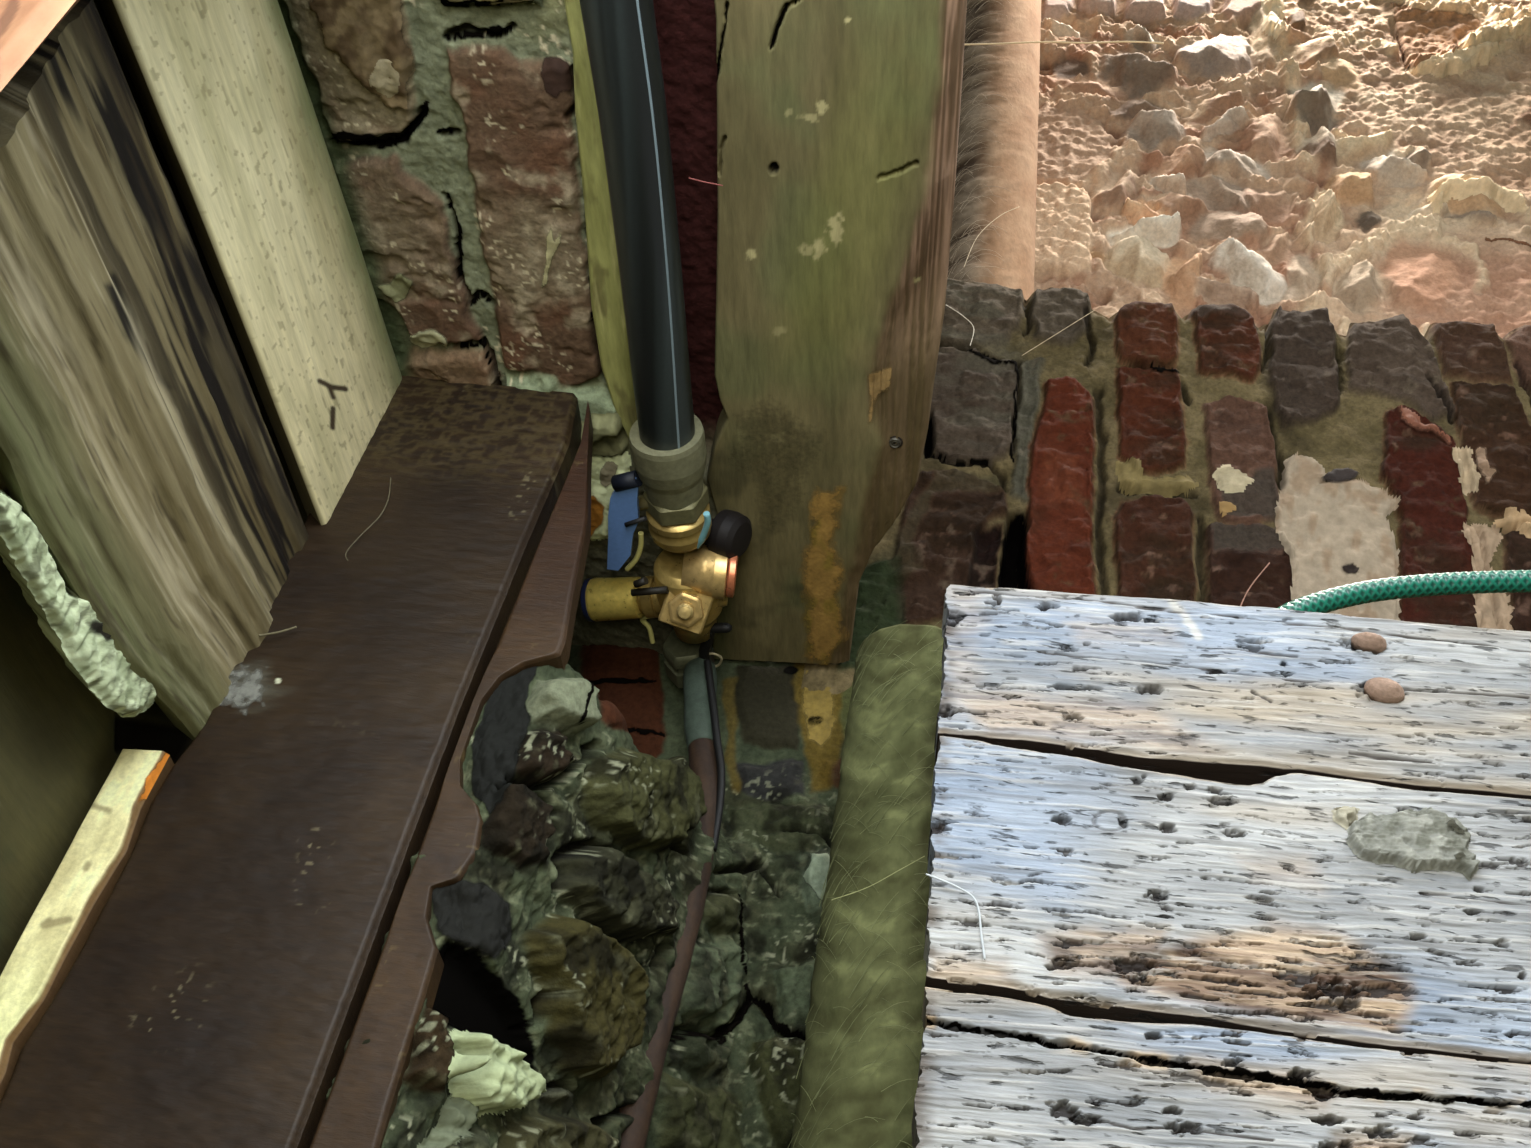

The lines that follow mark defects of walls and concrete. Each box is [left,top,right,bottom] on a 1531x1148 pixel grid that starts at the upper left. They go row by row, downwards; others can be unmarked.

crack [440,0,523,8]
crack [407,101,429,134]
crack [447,192,492,365]
spalling [1322,468,1359,482]
peeling [1475,447,1497,482]
peeling [1461,507,1531,572]
peeling [1473,593,1515,630]